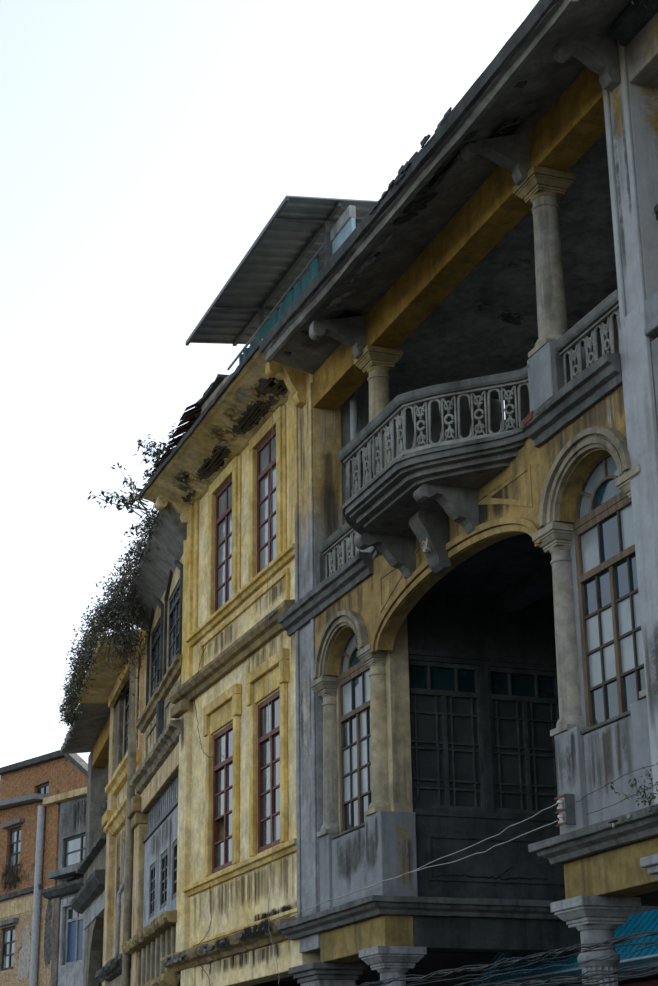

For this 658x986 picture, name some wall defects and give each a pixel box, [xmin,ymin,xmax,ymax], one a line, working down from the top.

leakage [646,634,658,703]
leakage [338,819,377,876]
leakage [218,872,268,908]
leakage [214,906,292,970]